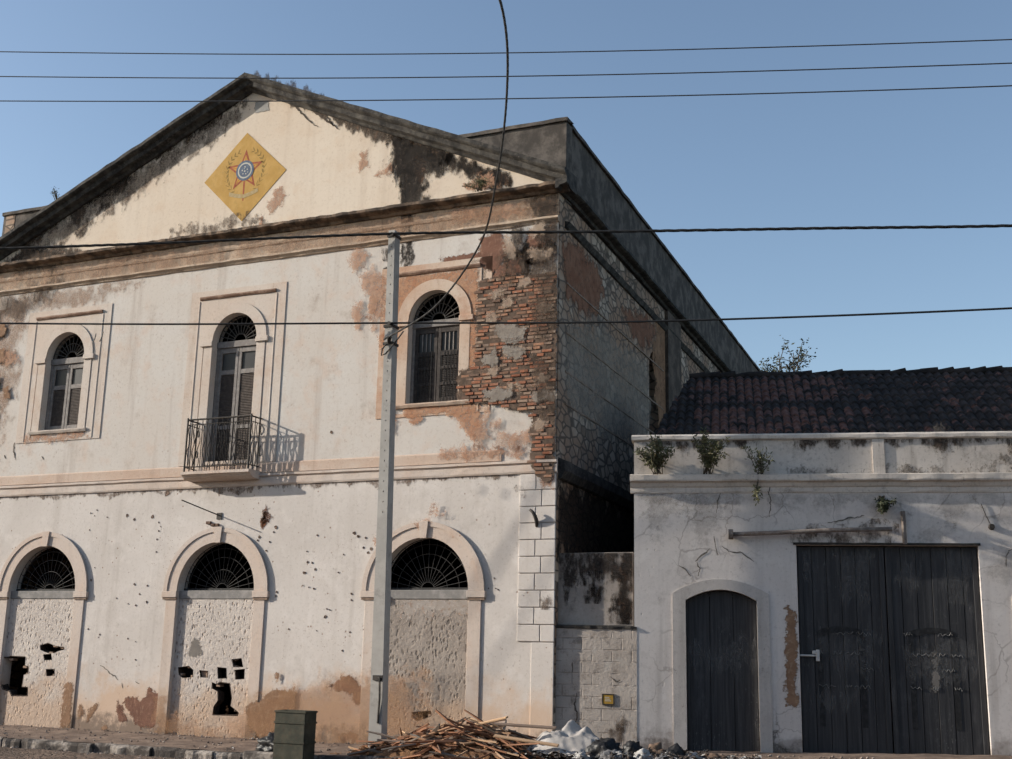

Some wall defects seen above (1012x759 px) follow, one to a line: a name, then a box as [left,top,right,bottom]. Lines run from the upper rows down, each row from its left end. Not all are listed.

damp [0,100,247,413]
damp [200,288,277,301]
damp [237,113,558,340]
flaking render [395,203,605,490]
damp [794,439,867,451]
damp [884,424,1012,473]
damp [557,486,634,625]
crack [680,538,754,576]
spalling [40,643,64,676]
spalling [116,687,158,730]
spalling [178,658,296,737]
spalling [783,605,800,708]